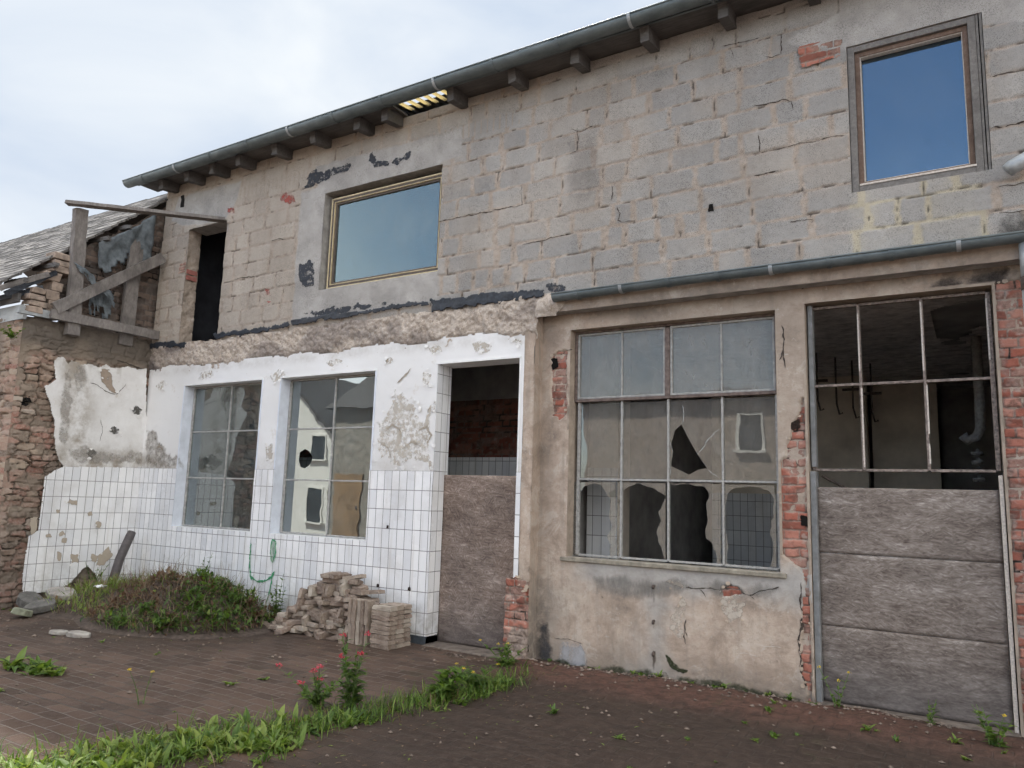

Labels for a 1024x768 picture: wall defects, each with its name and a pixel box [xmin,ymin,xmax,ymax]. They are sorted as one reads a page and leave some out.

crack [778,325,786,366]
peeling [98,368,119,393]
peeling [373,368,436,471]
flaking render [549,351,568,420]
spalling [30,517,113,567]
flaking render [777,395,814,702]
damp [539,624,585,666]
crack [686,584,807,686]